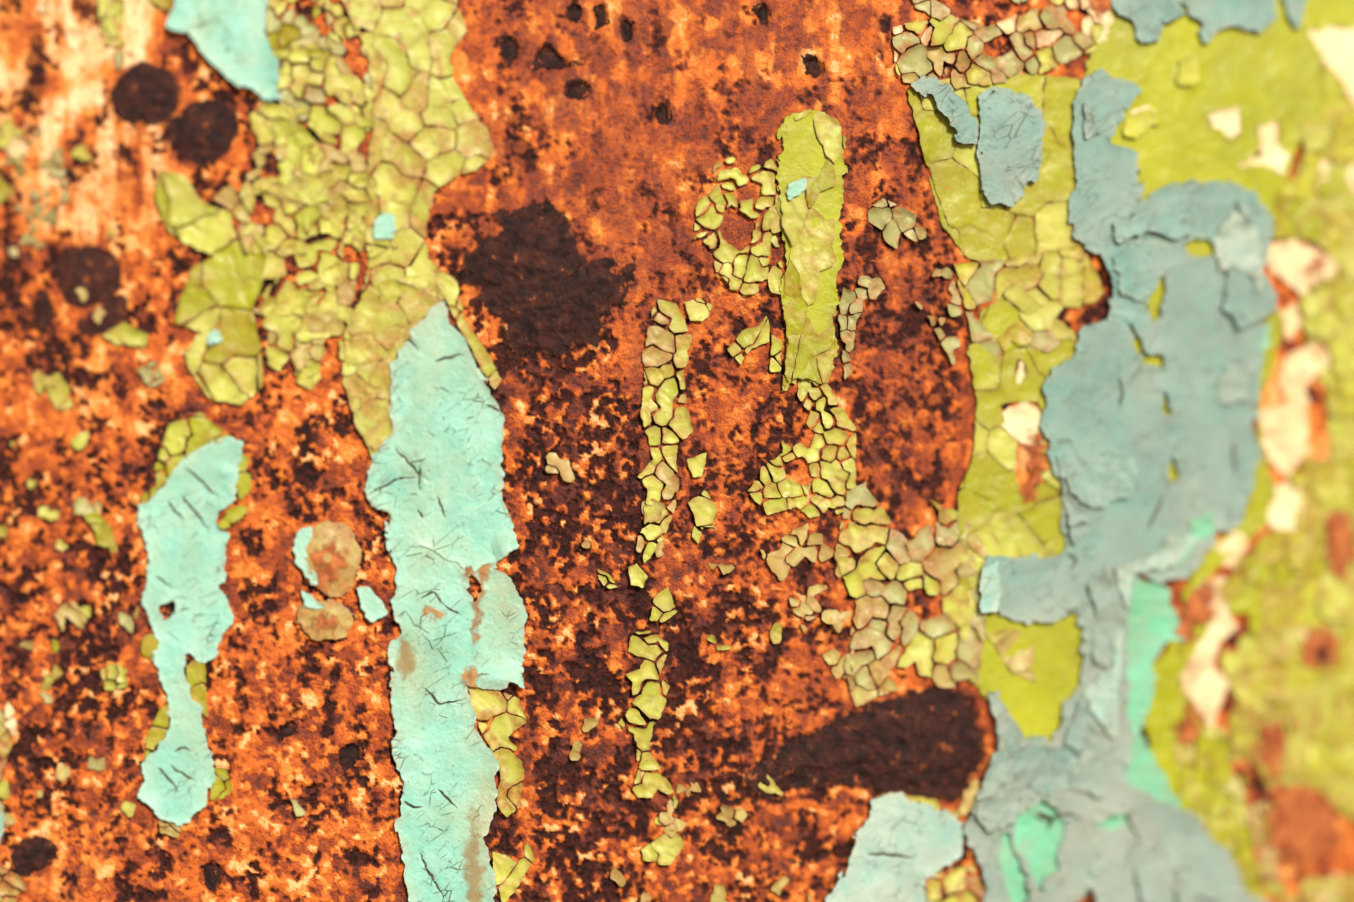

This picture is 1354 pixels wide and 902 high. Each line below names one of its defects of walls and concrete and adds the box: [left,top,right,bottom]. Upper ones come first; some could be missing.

corrosion [110,61,239,170]
corrosion [459,197,636,358]
crack [408,340,501,422]
peeling [151,0,535,902]
crack [368,448,446,518]
peeling [545,452,575,482]
peeling [693,0,1354,902]
peeling [118,412,251,838]
corrosion [293,520,388,641]
crack [407,591,488,705]
corrosion [741,684,987,803]
crack [1134,869,1143,902]